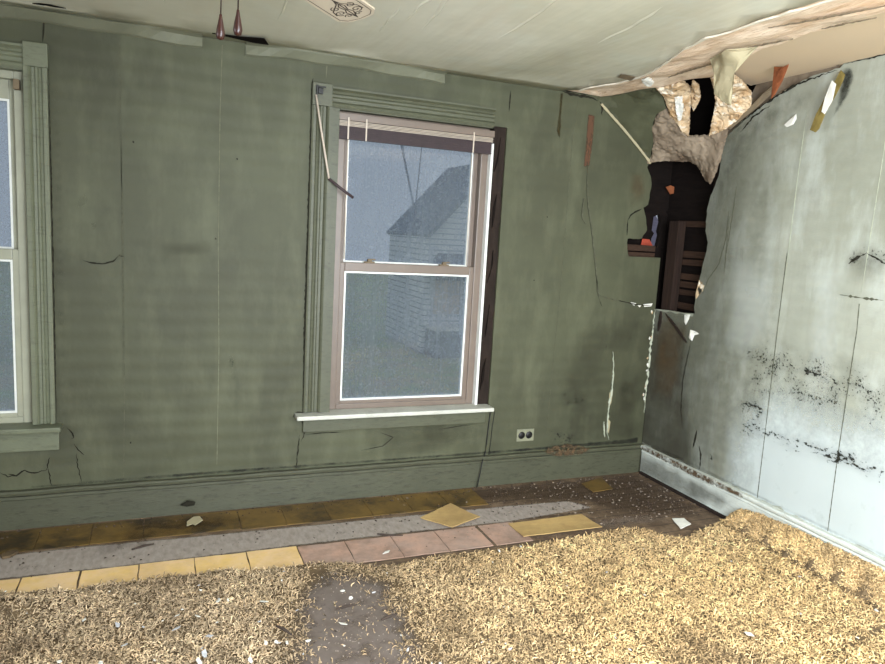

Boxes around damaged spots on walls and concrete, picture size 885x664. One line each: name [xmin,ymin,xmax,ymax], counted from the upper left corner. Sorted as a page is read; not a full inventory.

flaking render [627,65,842,497]
crack [1,459,52,485]
peeling [603,353,614,439]
damp [741,348,885,557]